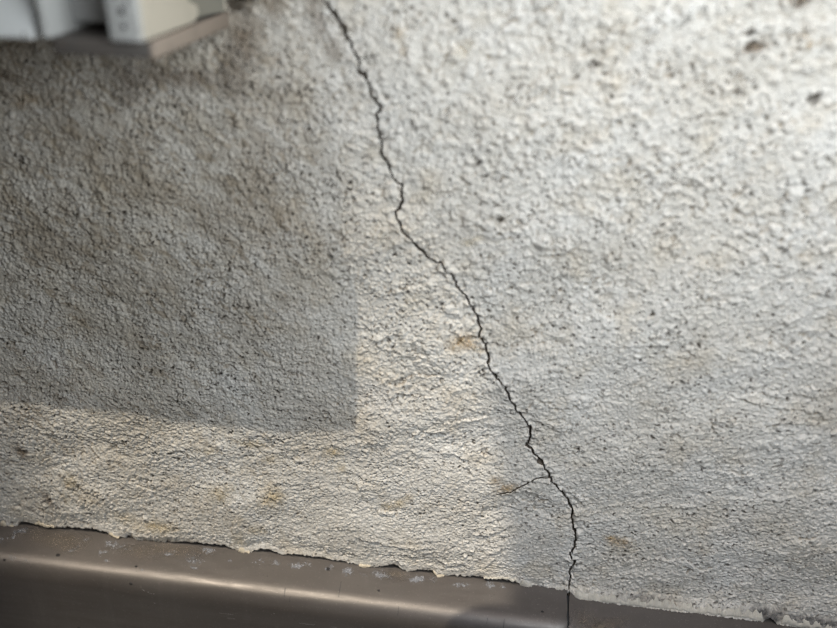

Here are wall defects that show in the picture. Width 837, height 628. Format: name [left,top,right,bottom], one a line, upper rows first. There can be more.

crack [322,0,582,628]